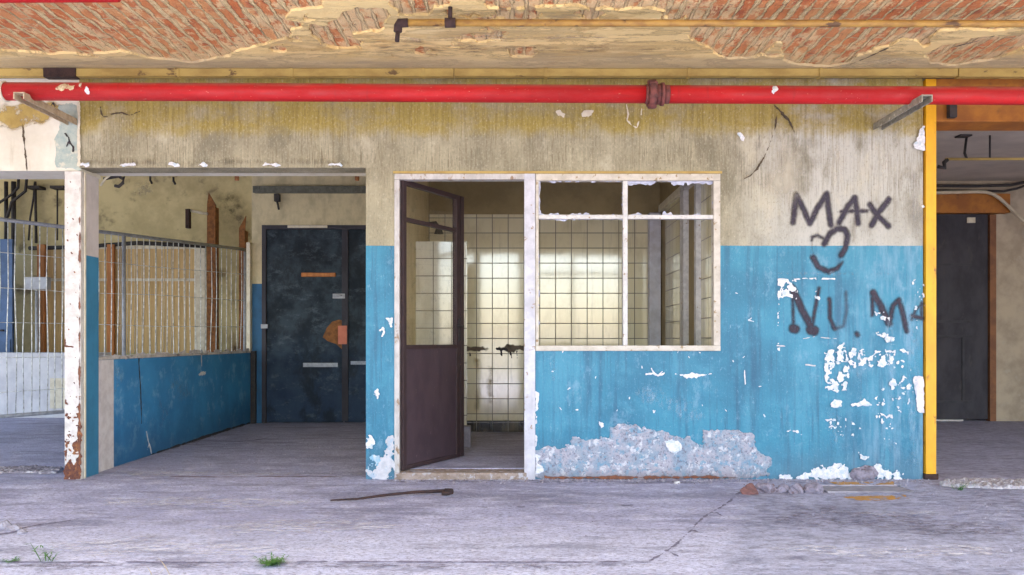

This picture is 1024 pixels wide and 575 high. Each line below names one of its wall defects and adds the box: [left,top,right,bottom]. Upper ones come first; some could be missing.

flaking render [0,0,450,61]
flaking render [455,0,1024,65]
crack [744,105,795,179]
peeling [777,278,835,300]
corrosion [63,286,83,480]
peeling [645,368,712,379]
peeling [803,311,925,444]
peeling [365,435,395,480]
flaking render [535,391,904,485]
crack [281,492,740,563]
crack [0,558,235,566]